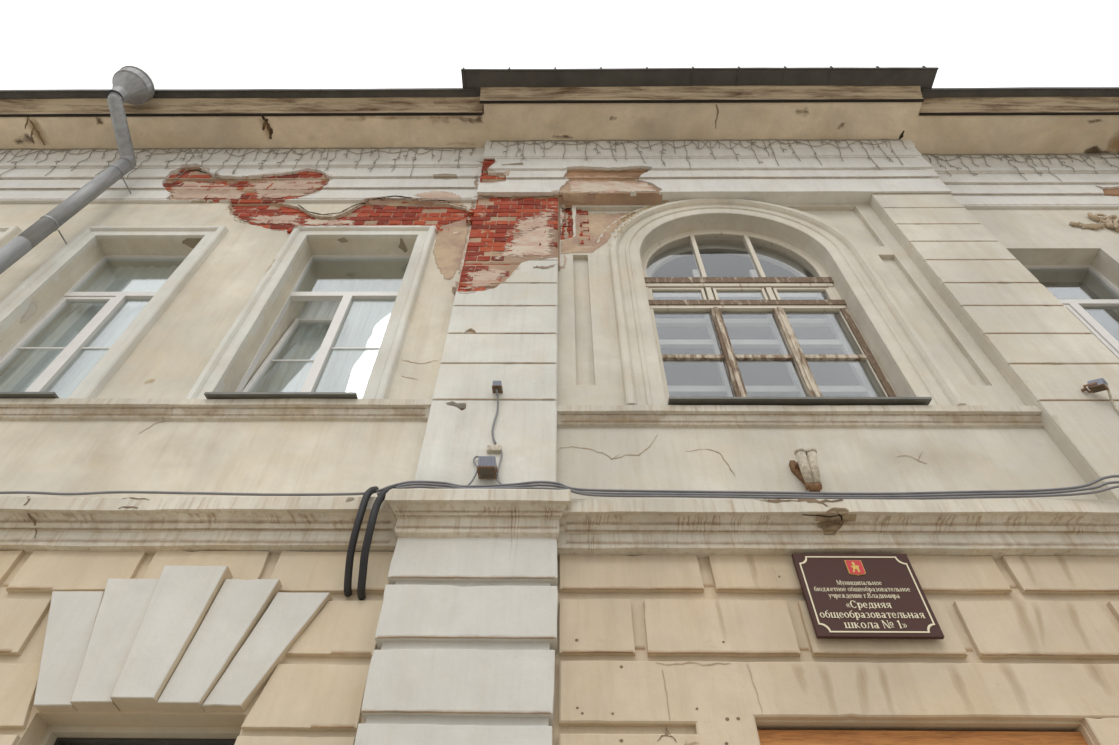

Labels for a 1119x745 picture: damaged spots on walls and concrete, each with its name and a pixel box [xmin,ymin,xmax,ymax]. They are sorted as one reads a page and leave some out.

crack [25,117,45,145]
crack [261,116,273,139]
damp [1085,138,1119,154]
flaking render [163,159,668,294]
crack [558,434,658,459]
spalling [815,509,857,535]
crack [657,670,699,745]